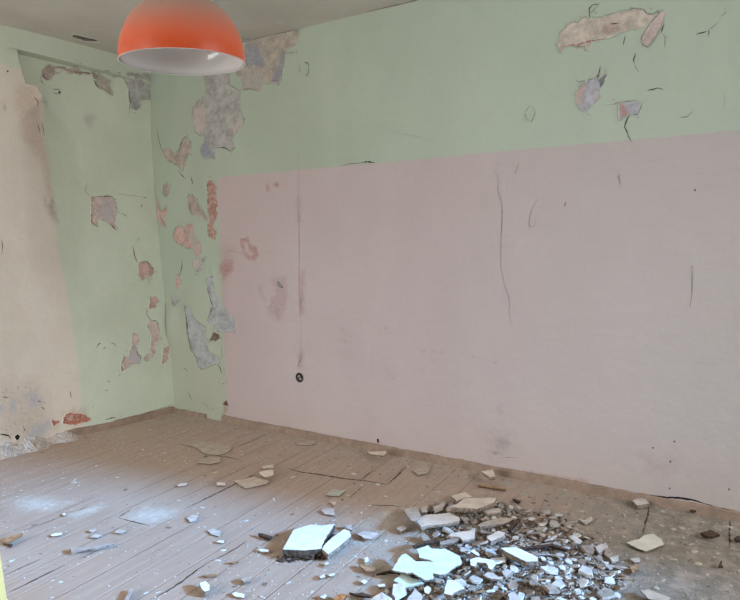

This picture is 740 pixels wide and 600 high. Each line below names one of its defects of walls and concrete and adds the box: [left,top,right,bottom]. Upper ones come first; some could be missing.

flaking render [4,63,152,233]
peeling [157,29,301,179]
peeling [573,66,609,119]
peeling [554,7,667,54]
peeling [611,99,645,141]
peeling [85,177,237,376]
crack [493,163,519,325]
peeling [0,347,98,433]